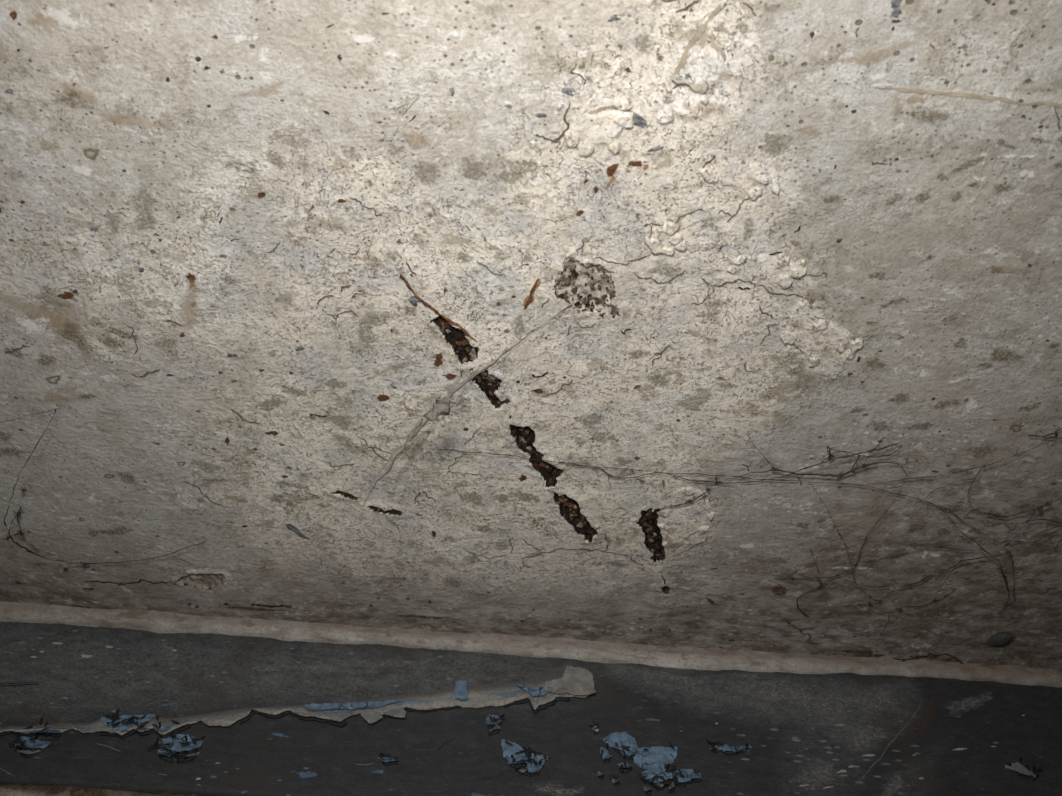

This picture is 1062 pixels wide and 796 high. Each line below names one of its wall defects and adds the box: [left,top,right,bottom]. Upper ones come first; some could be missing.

spalling [539,245,631,327]
rust [434,353,456,380]
crack [447,427,483,477]
spalling [408,295,606,546]
crack [531,372,573,397]
flaking render [628,480,718,566]
peeling [0,666,596,777]
peeling [589,719,702,796]